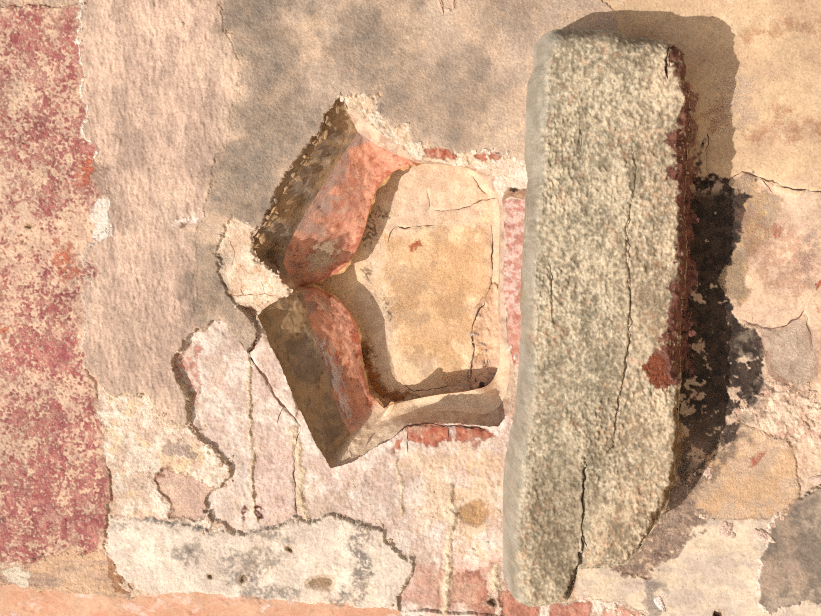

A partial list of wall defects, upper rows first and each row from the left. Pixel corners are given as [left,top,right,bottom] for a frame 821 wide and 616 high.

crack [237,332,301,513]
spalling [0,0,647,616]
crack [576,462,587,569]
crack [607,150,637,452]
leakage [612,44,764,615]
spalling [720,175,779,305]
spalling [686,318,821,616]